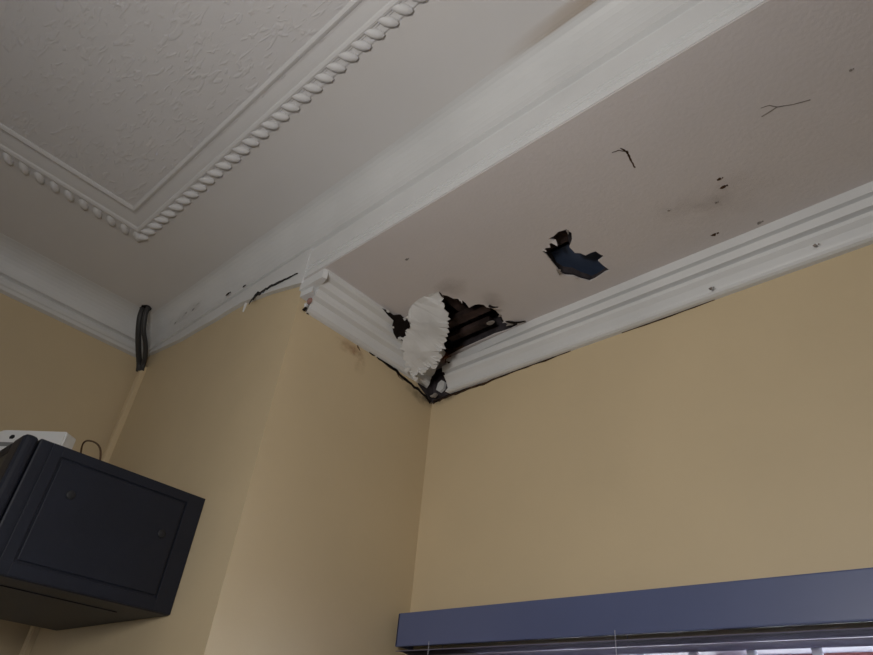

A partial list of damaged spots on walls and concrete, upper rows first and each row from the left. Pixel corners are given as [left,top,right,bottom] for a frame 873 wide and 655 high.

spalling [544,232,609,280]
crack [249,273,298,304]
peeling [382,292,517,404]